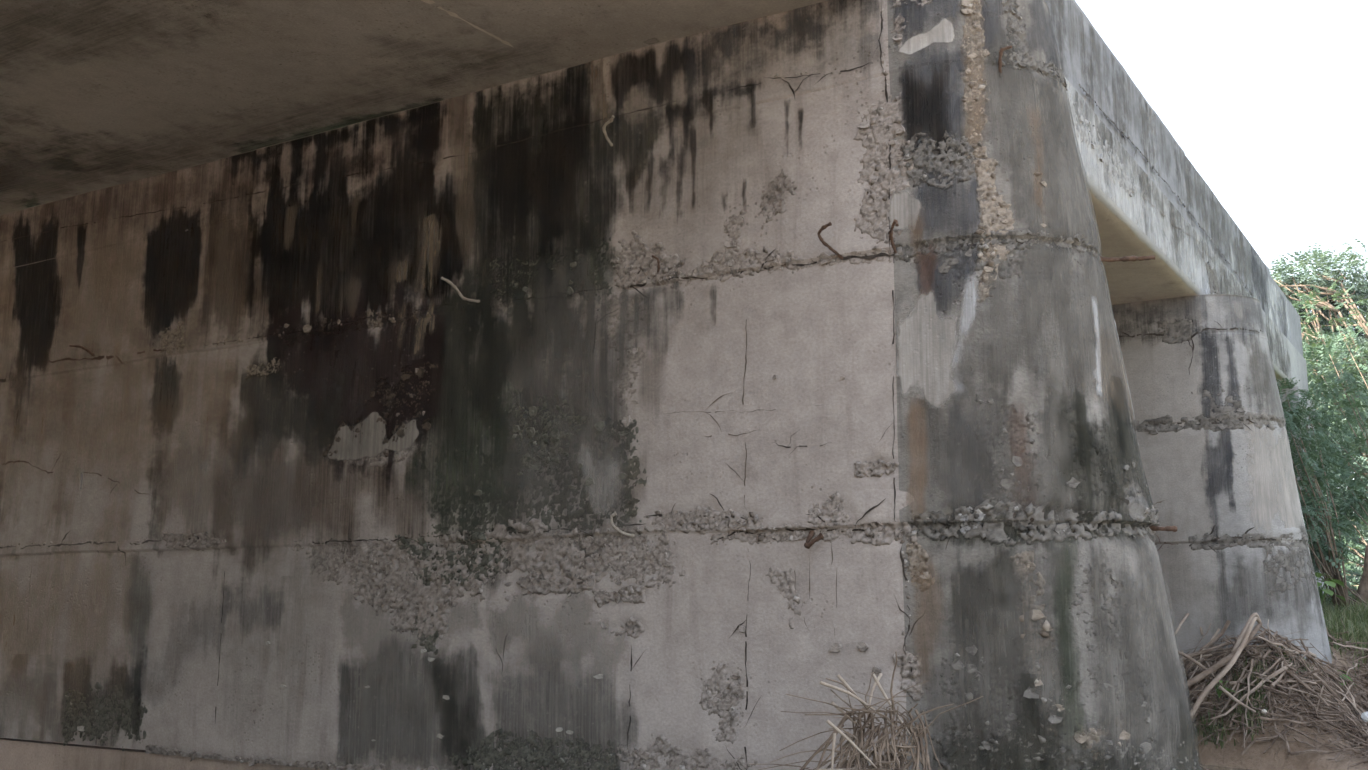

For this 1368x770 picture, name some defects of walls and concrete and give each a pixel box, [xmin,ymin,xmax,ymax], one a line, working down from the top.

spalling [610,0,1137,303]
peeling [898,291,956,408]
damp [900,0,1290,770]
spalling [1157,317,1193,344]
spalling [289,389,1318,770]
damp [62,651,147,744]
spalling [61,663,758,770]
damp [337,639,637,770]